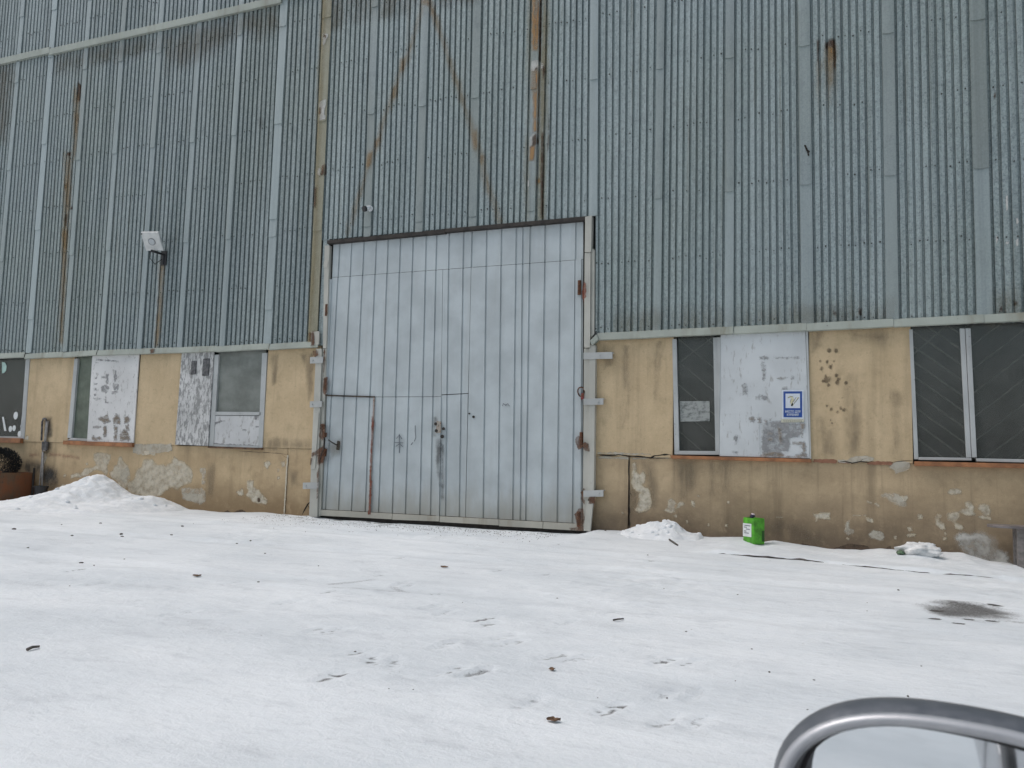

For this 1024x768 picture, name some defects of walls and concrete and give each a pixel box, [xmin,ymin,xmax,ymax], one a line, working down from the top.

rust [817,39,836,67]
rust [528,0,549,214]
flaking render [60,359,204,503]
rust [575,436,590,451]
peeling [749,417,850,464]
flaking render [225,480,267,512]
flaking render [598,452,663,513]
crack [599,454,671,528]
flaking render [834,489,992,550]